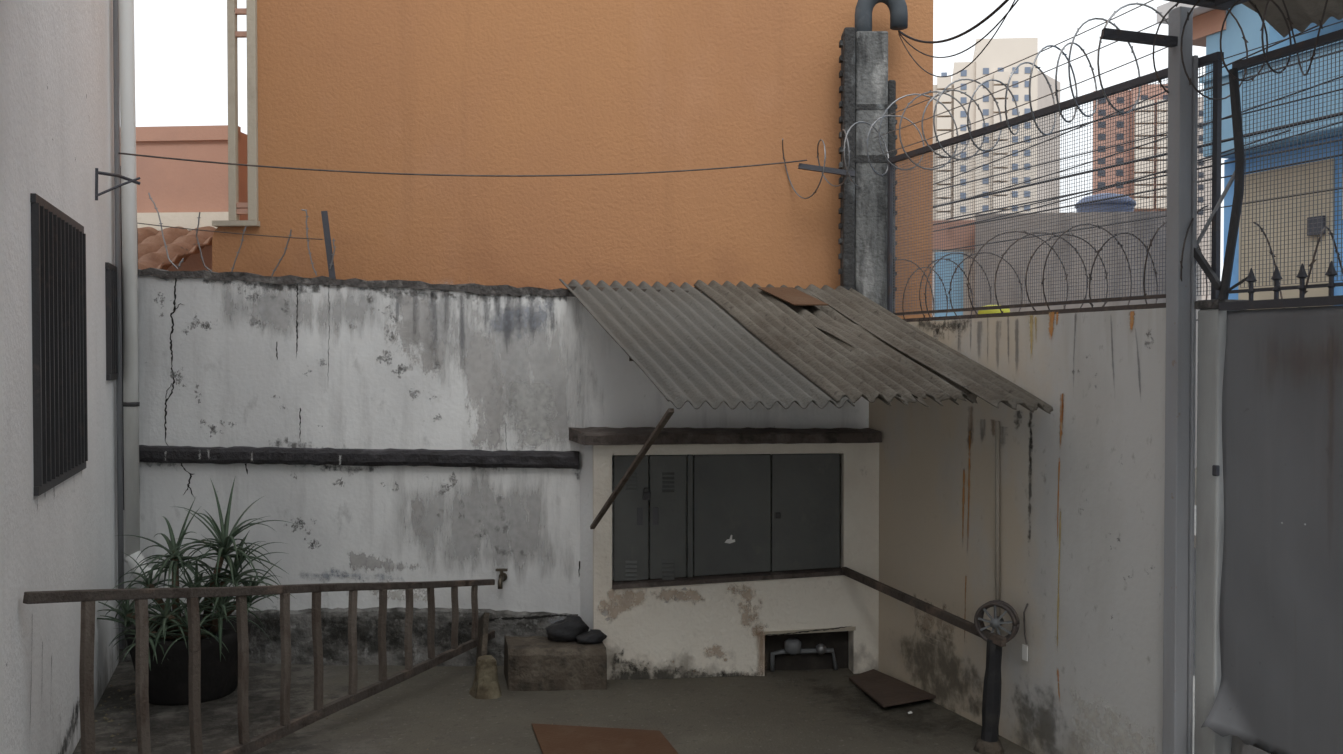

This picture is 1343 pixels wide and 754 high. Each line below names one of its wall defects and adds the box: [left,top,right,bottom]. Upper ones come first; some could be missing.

crack [164,278,195,499]
water stain [225,282,581,437]
corrosion [1030,312,1058,352]
corrosion [962,424,972,538]
flaking render [349,552,413,572]
water stain [1019,697,1055,754]